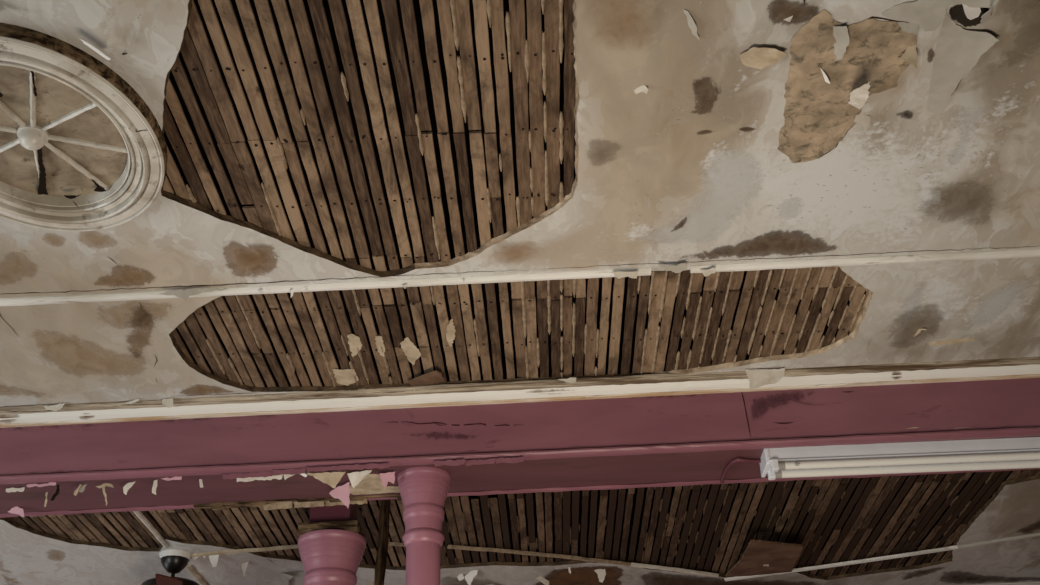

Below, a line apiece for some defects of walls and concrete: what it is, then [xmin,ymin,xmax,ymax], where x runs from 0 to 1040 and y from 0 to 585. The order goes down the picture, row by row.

flaking render [740,0,999,163]
water stain [225,243,276,276]
flaking render [161,0,874,392]
water stain [695,231,836,260]
water stain [44,307,156,371]
flaking render [0,481,310,585]
peeling [152,476,182,495]
flaking render [222,463,406,585]
flaking render [440,469,1040,585]